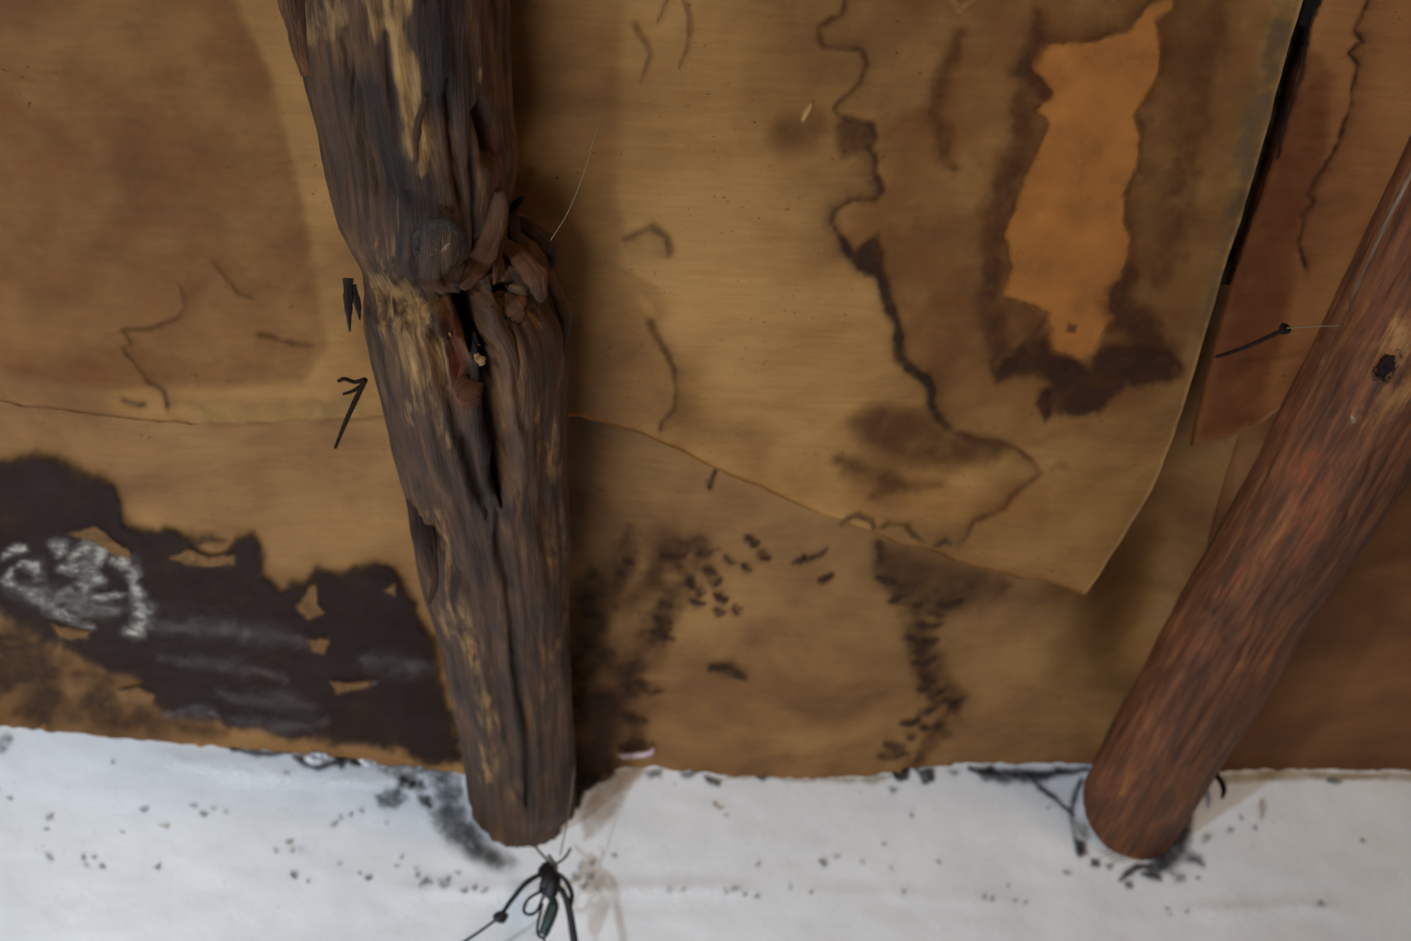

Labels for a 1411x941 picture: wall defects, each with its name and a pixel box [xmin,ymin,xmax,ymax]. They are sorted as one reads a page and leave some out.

leakage [817,0,999,461]
leakage [976,0,1181,418]
leakage [570,535,771,777]
leakage [793,550,824,564]
leakage [841,515,978,767]